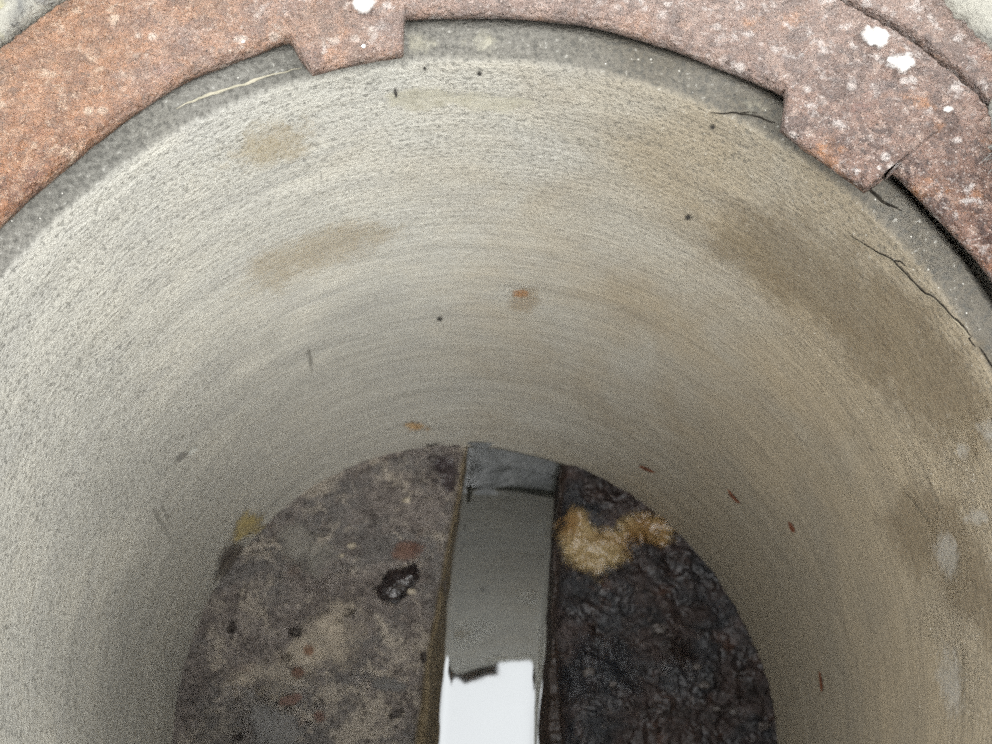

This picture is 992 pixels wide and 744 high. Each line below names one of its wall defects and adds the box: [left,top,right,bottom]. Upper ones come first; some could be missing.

crack [711,112,776,123]
crack [869,190,902,211]
crack [851,236,992,367]